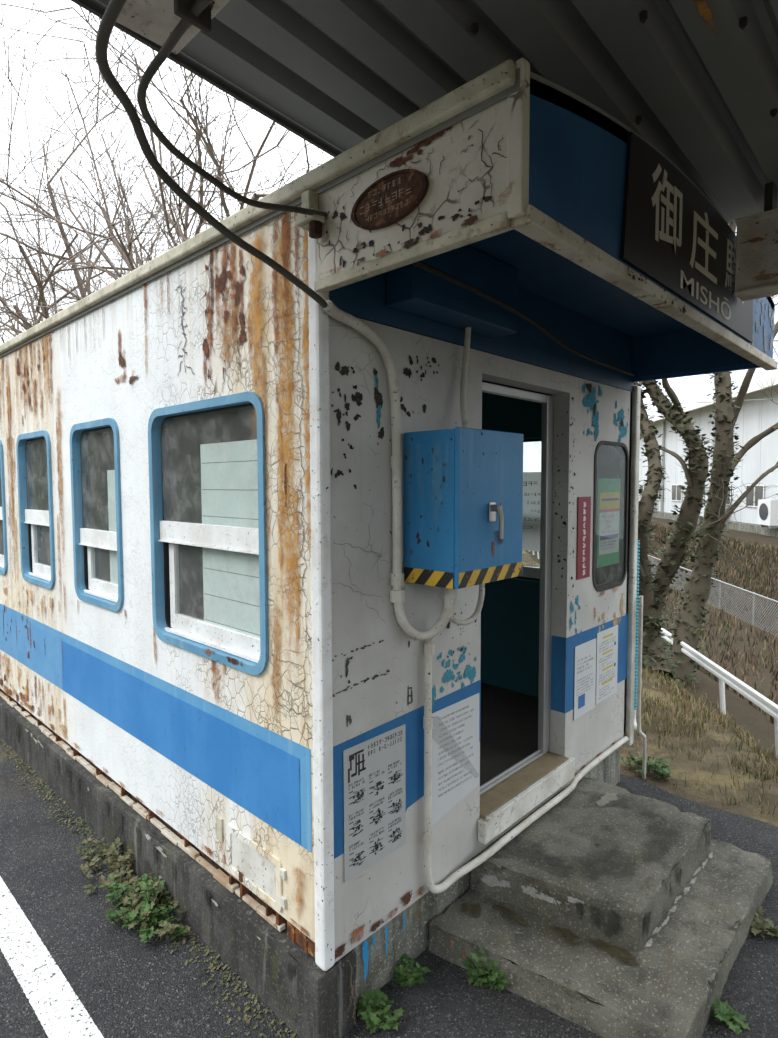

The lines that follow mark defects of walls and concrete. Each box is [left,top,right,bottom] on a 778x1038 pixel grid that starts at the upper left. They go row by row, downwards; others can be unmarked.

crack [336,128,507,252]
peeling [387,196,492,253]
crack [177,252,254,410]
rust [0,334,78,618]
rust [203,213,311,710]
peeling [331,362,384,489]
rust [0,657,79,749]
peeling [432,604,477,709]
leakage [596,792,628,807]
rust [335,887,423,959]
leakage [481,874,620,936]
leakage [645,830,713,947]